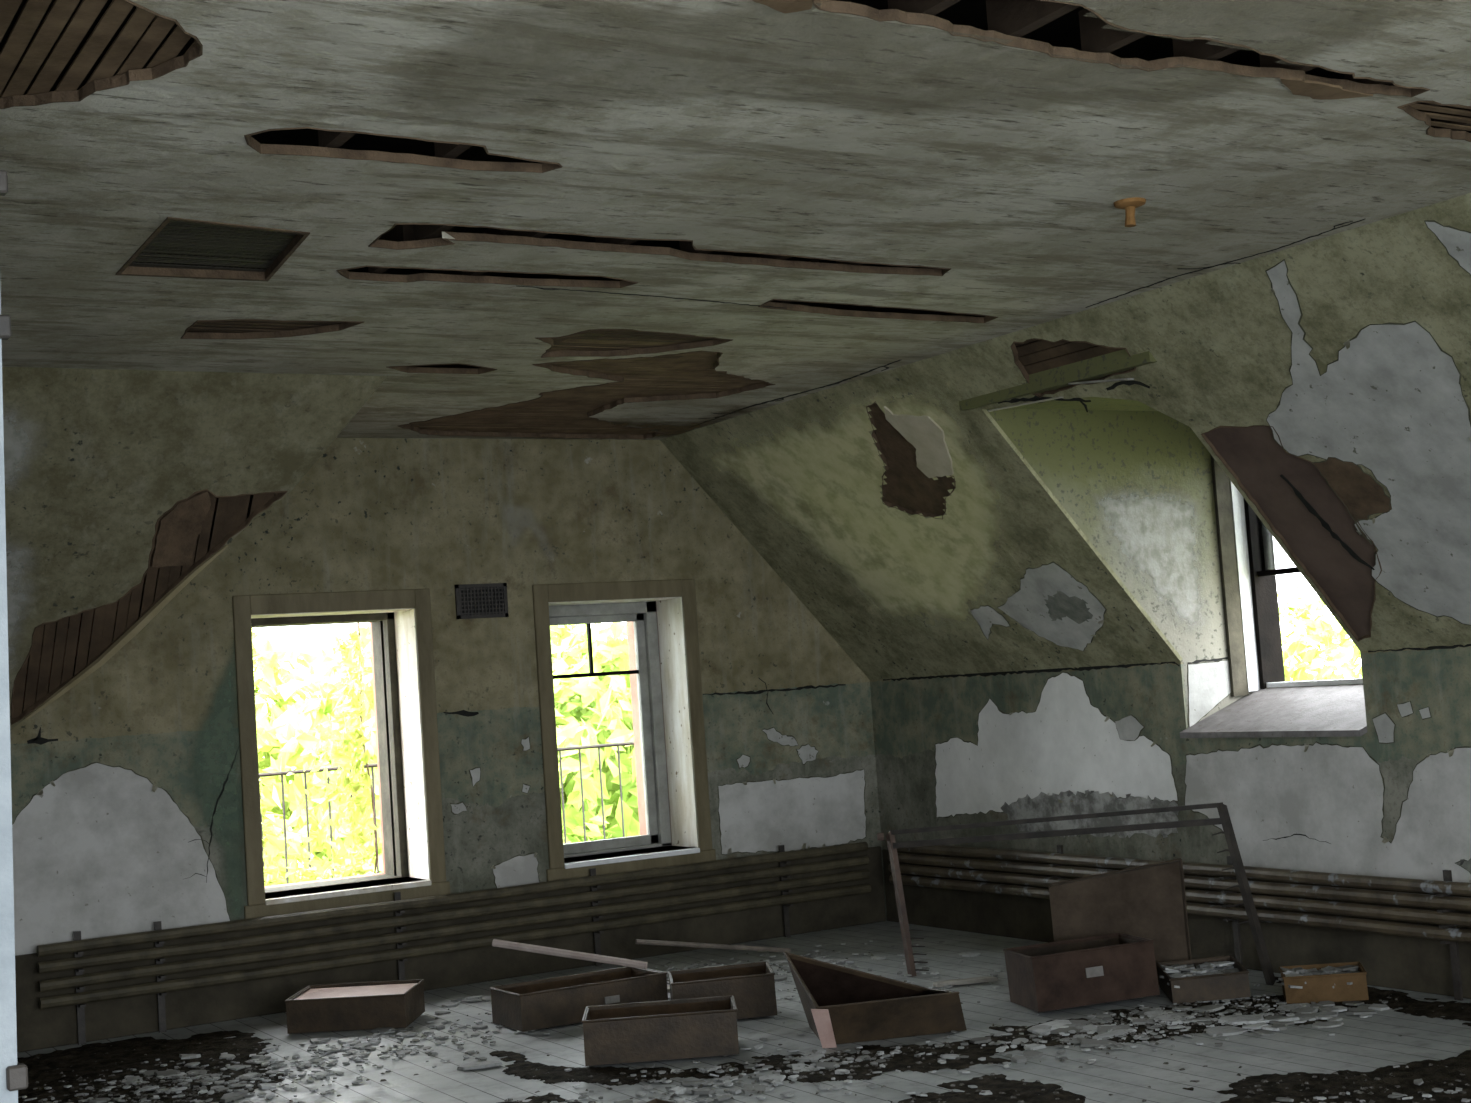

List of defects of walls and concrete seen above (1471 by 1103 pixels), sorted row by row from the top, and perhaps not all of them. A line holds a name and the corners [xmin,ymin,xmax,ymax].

peeling [1424,220,1471,276]
flaking render [1011,338,1136,403]
flaking render [866,401,956,519]
peeling [1201,259,1471,642]
flaking render [11,489,287,725]
peeling [969,562,1107,651]
peeling [1187,660,1231,727]
peeling [718,727,866,855]
peeling [935,672,1471,883]
peeling [12,762,231,956]